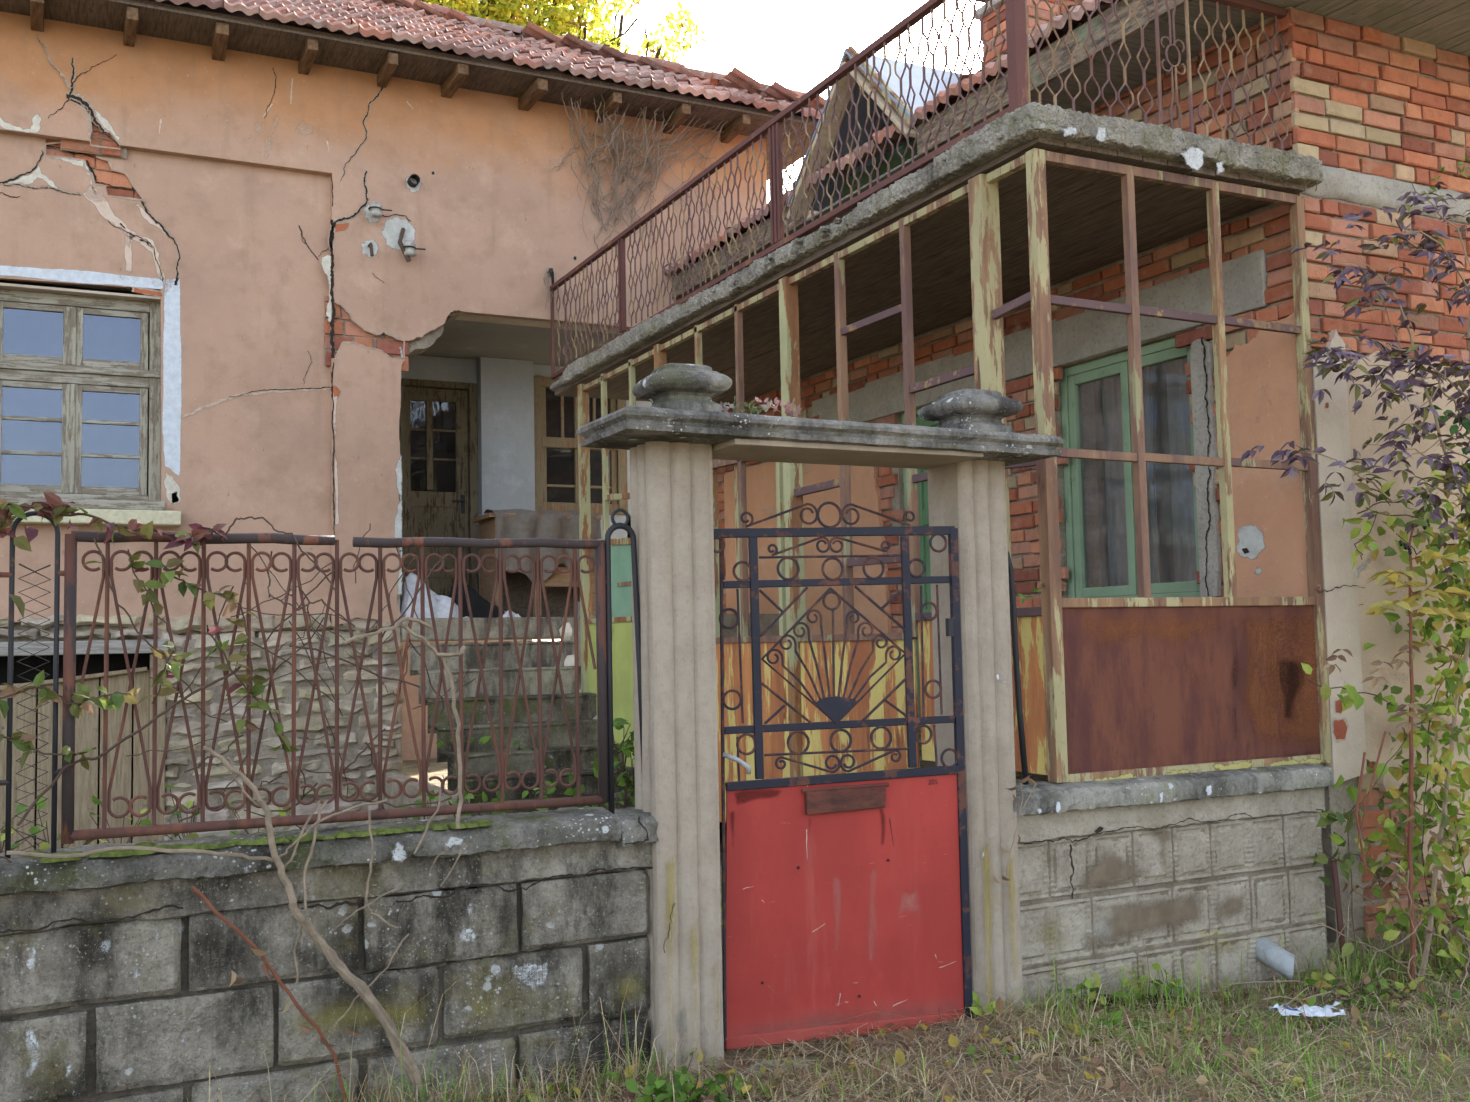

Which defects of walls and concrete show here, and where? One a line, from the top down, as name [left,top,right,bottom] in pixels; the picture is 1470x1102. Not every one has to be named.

flaking render [0,93,167,297]
crack [0,36,182,285]
crack [181,87,410,536]
flaking render [321,255,409,436]
peeling [393,456,403,594]
crack [1190,337,1222,597]
rust [1233,623,1317,737]
damp [1083,855,1139,888]
damp [1089,894,1200,946]
damp [1218,898,1243,918]